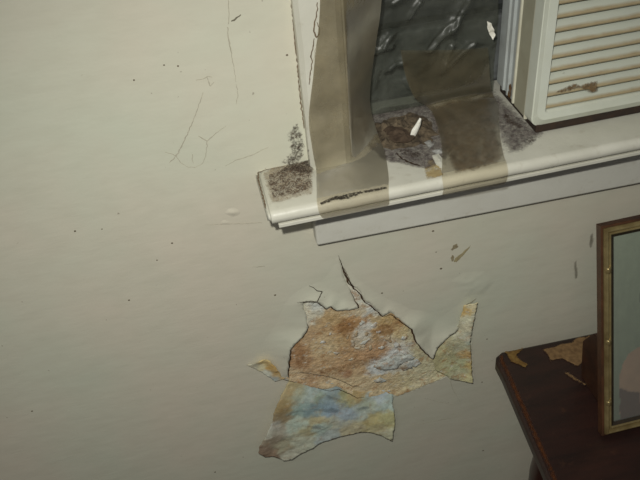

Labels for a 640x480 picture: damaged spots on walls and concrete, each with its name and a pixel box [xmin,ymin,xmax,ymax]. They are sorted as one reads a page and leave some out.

water stain [266,127,312,201]
water stain [366,100,447,168]
water stain [483,91,542,150]
peeling [247,256,478,461]